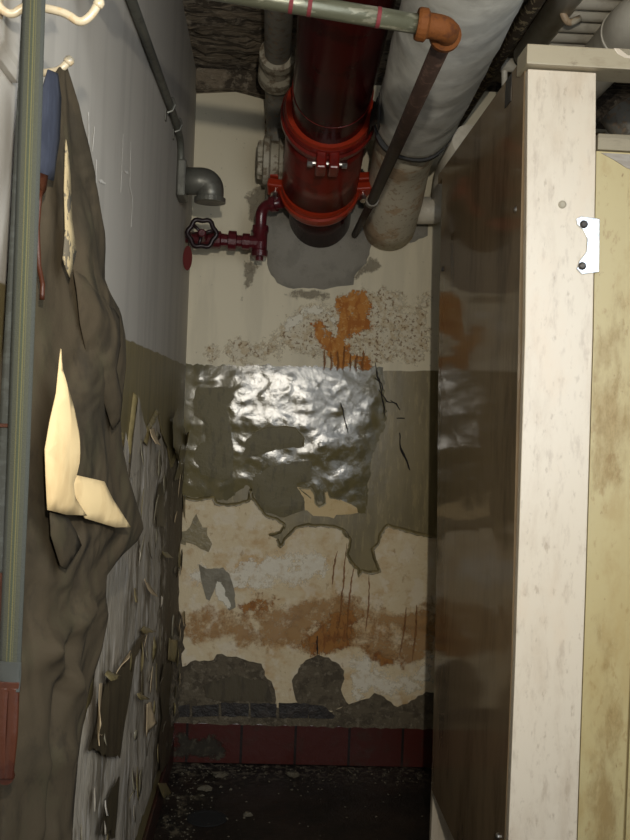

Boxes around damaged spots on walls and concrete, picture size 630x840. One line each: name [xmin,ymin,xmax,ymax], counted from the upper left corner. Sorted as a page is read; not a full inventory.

peeling [203,286,432,369]
rust [310,290,372,372]
crack [375,362,410,470]
peeling [73,392,437,840]